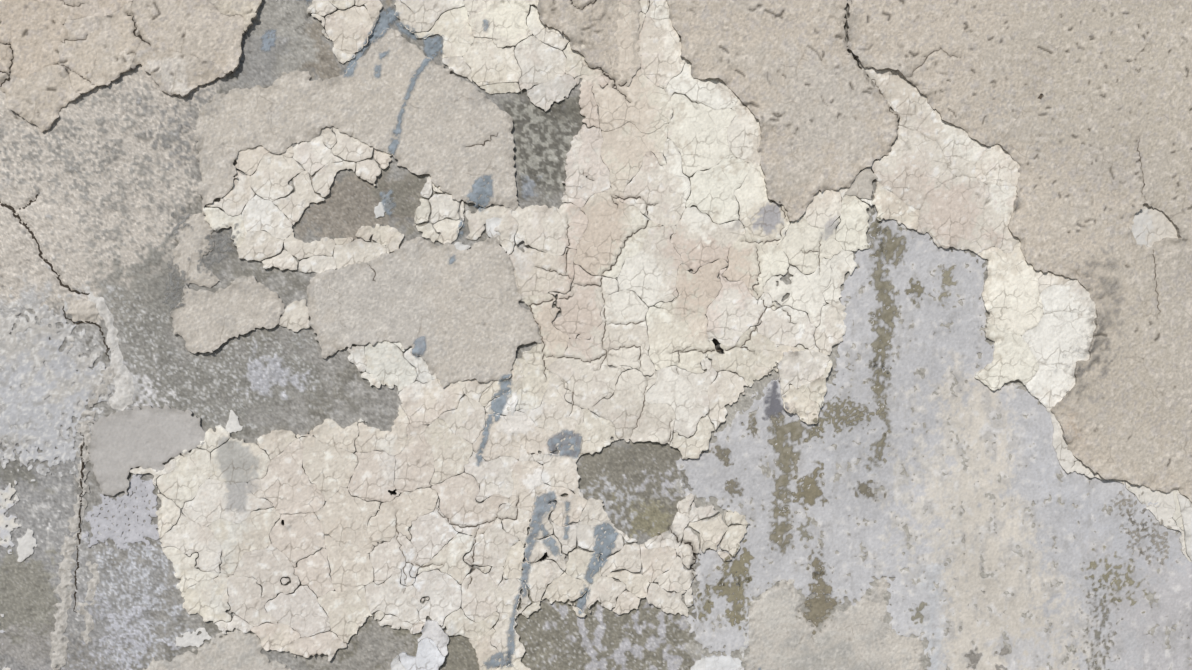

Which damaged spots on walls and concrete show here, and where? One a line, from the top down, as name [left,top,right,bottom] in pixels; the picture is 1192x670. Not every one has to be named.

crack [0,43,14,87]
crack [593,67,631,103]
crack [0,192,110,360]
crack [528,172,658,437]
peeling [169,0,1097,459]
crack [672,201,822,375]
peeling [518,0,1192,670]
peeling [0,287,114,562]
peeling [81,340,580,670]
crack [395,514,443,593]
crack [438,497,519,589]
crack [670,527,697,579]